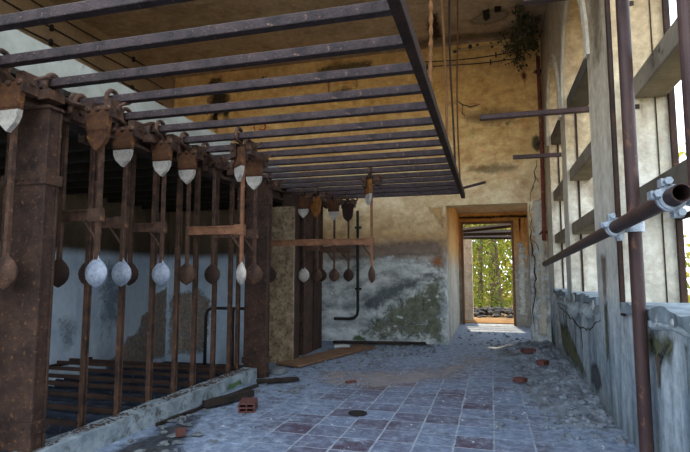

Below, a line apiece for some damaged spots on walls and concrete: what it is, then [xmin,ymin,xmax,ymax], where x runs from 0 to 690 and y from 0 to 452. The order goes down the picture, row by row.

leakage [210,94,229,104]
crack [529,160,540,327]
leakage [103,269,118,320]
spalling [106,288,167,369]
leakage [359,273,449,344]
leakage [551,309,586,376]
crack [557,303,600,349]